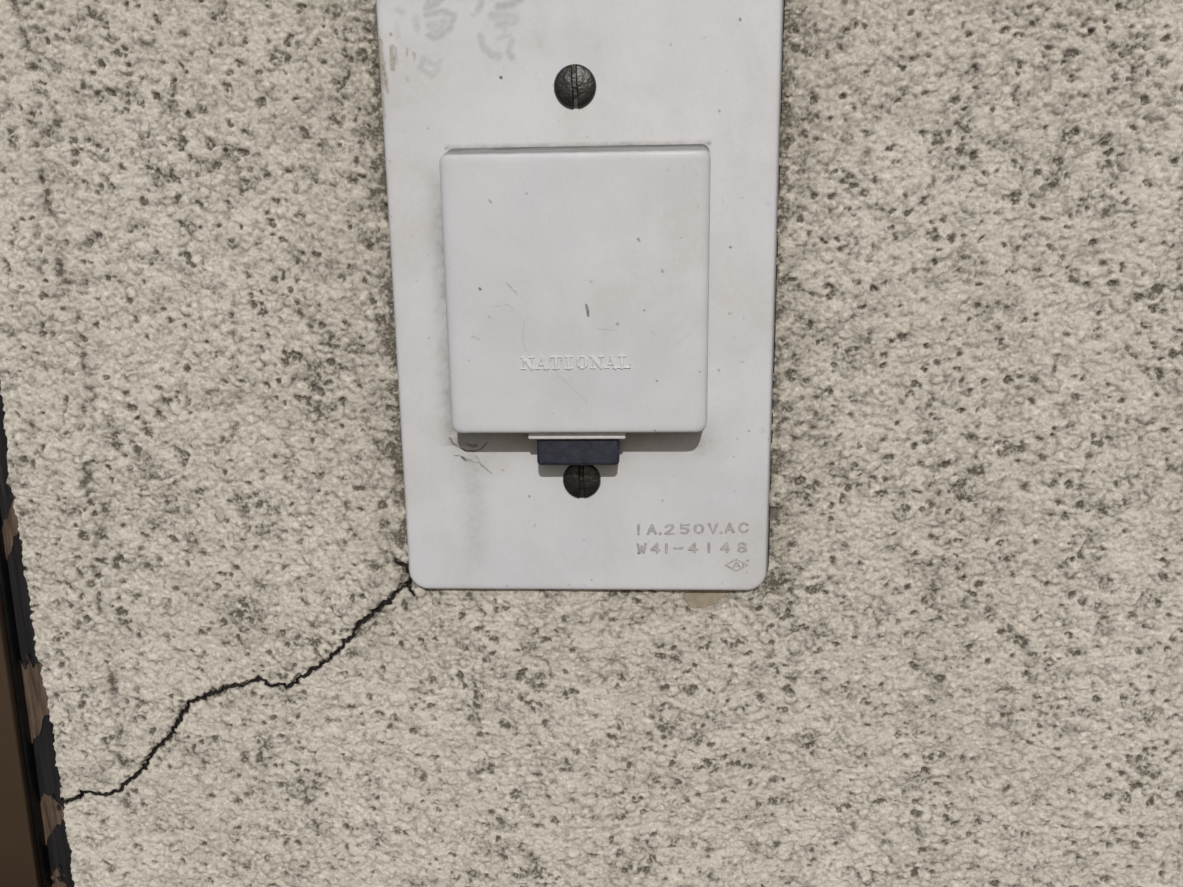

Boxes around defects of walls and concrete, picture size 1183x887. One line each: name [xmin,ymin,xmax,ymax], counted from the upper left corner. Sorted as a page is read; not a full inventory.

crack [60,560,415,804]